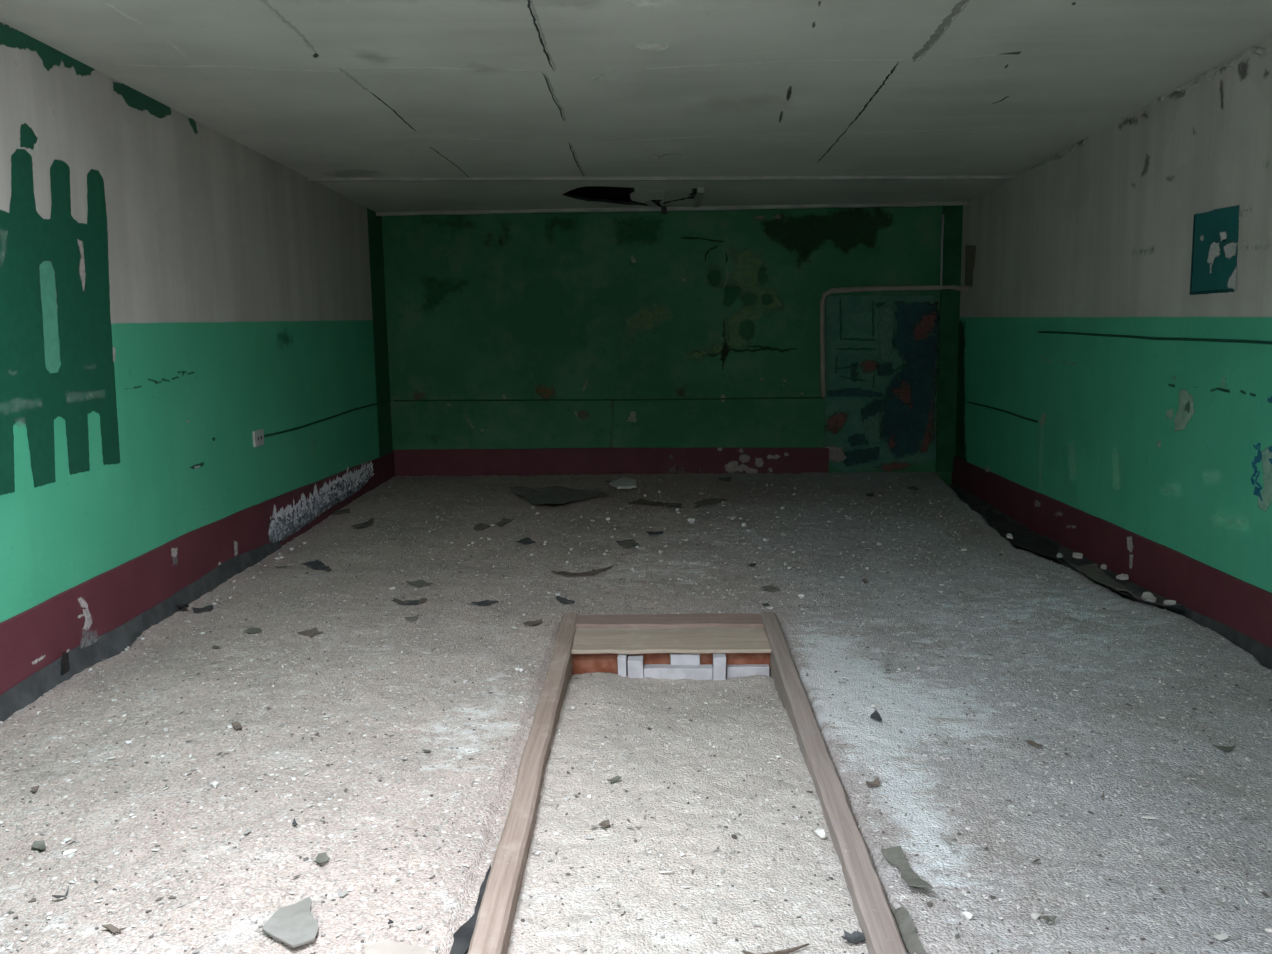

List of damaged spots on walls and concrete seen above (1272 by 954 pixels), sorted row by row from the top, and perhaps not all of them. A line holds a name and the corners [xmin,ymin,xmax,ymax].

peeling [0,23,94,76]
peeling [112,81,171,119]
crack [527,0,586,177]
crack [817,0,971,163]
crack [684,319,797,370]
spalling [1166,377,1194,431]
leakage [268,461,374,544]
spalling [717,447,788,473]
spalling [1250,443,1272,511]